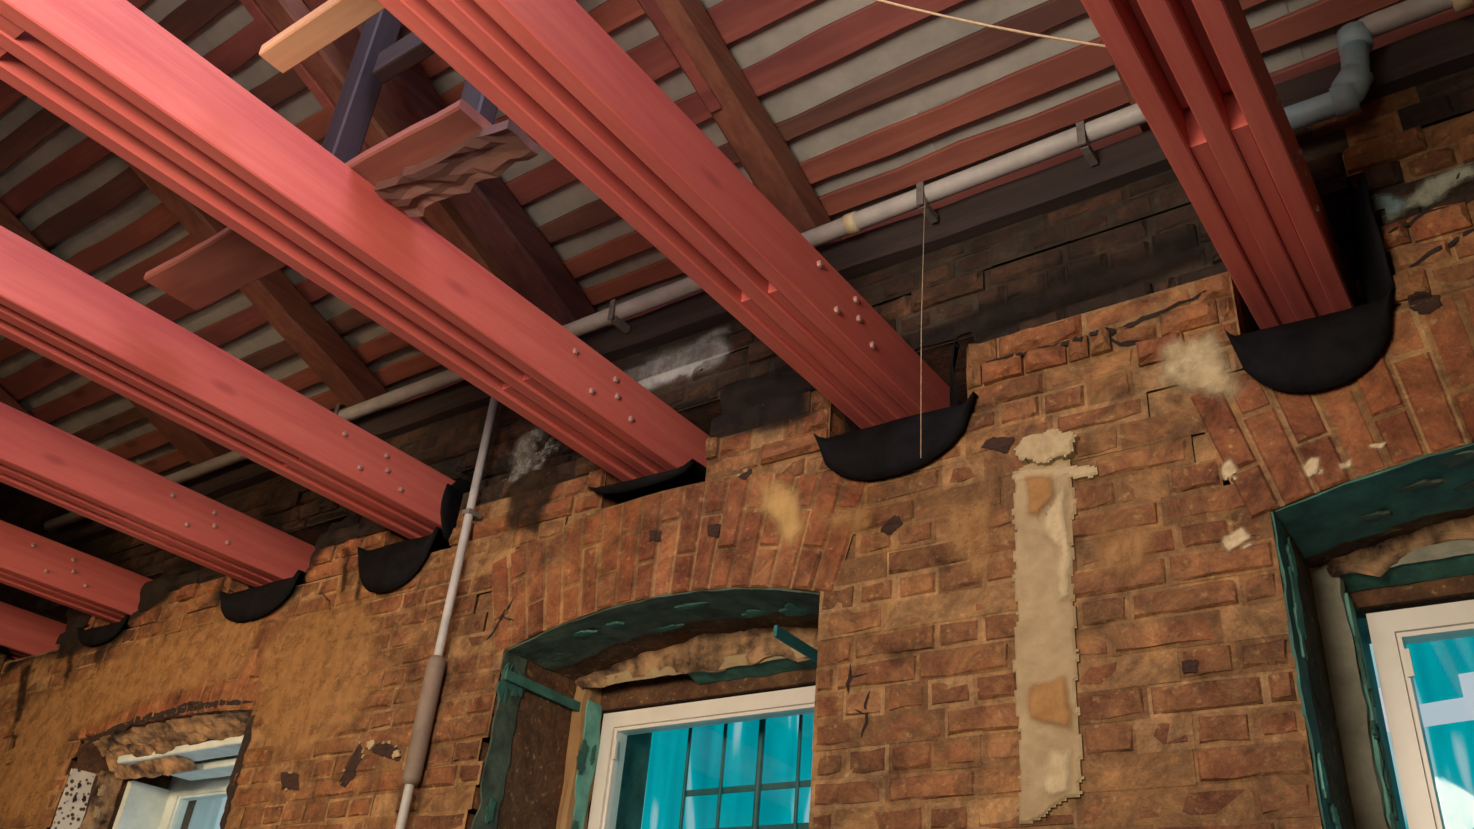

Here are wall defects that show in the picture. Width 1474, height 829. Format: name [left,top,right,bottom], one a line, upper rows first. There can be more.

crack [1388,199,1474,267]
crack [846,665,870,737]
spalling [339,740,402,788]
peeling [51,768,123,829]